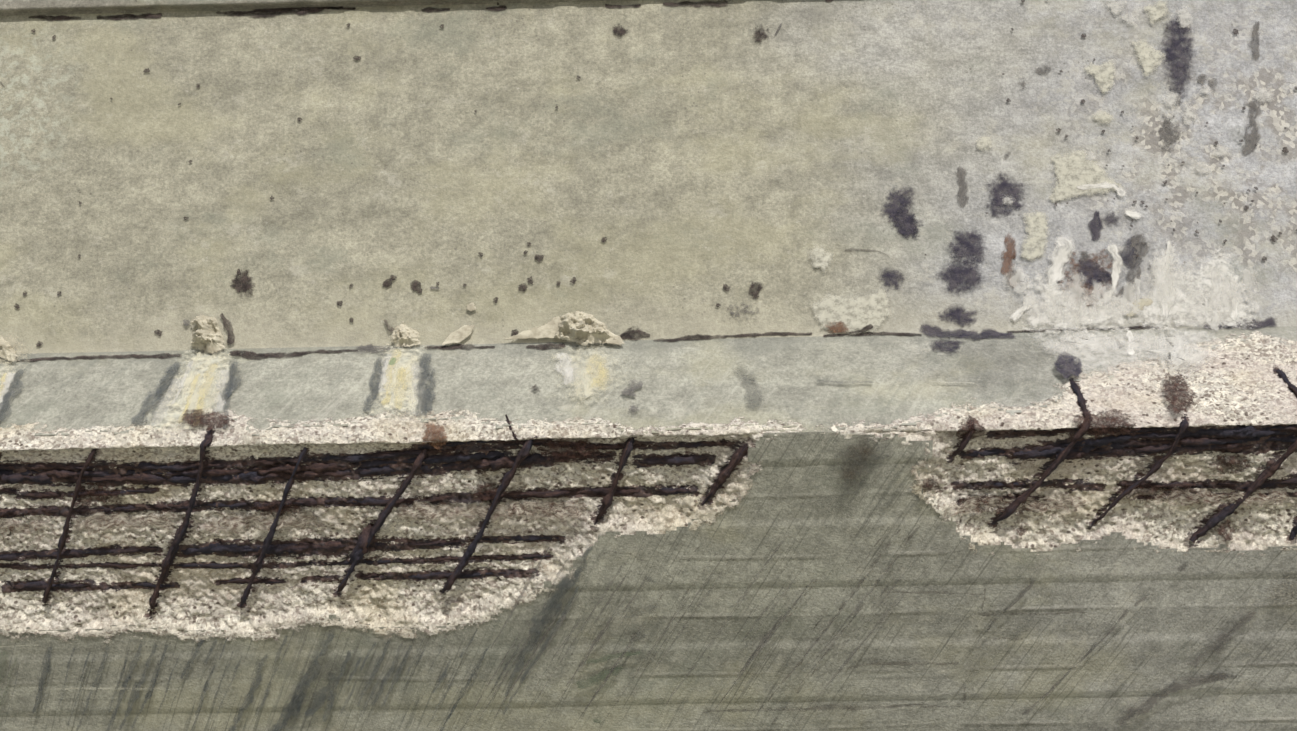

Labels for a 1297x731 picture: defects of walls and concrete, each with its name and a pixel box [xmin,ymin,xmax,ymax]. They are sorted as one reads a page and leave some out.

leakage [1160,19,1216,151]
leakage [957,167,969,207]
leakage [987,173,1023,217]
peeling [809,247,832,270]
spalling [411,280,439,293]
leakage [0,182,1276,429]
peeling [812,288,890,332]
spalling [0,330,1297,644]